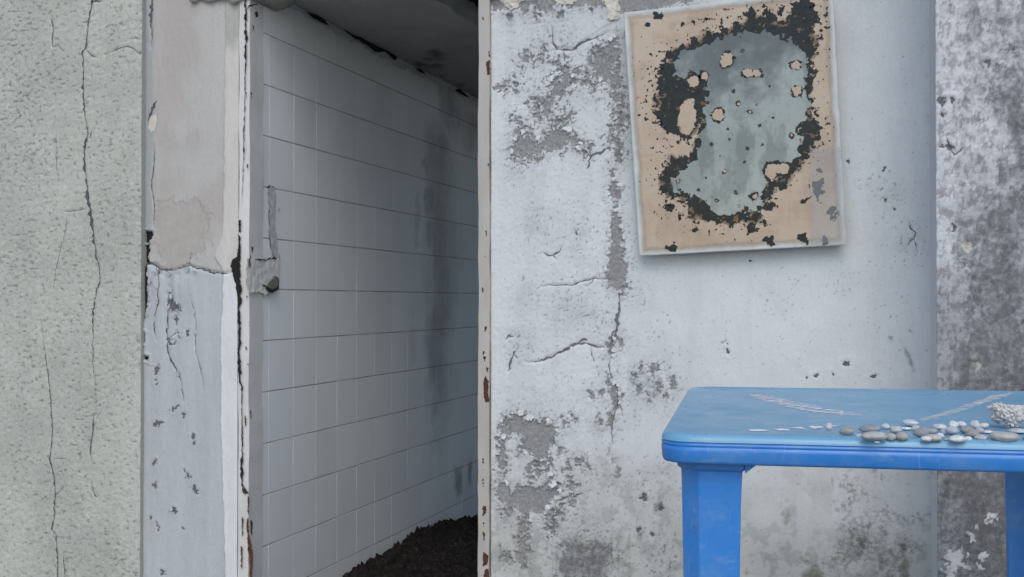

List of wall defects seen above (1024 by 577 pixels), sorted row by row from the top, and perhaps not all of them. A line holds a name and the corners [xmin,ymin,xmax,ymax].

crack [51,0,153,386]
peeling [165,297,190,345]
spalling [230,220,241,305]
peeling [267,185,280,261]
crack [544,277,613,286]
spalling [490,0,693,359]
crack [506,335,622,440]
crack [43,343,65,577]
spalling [491,410,591,570]